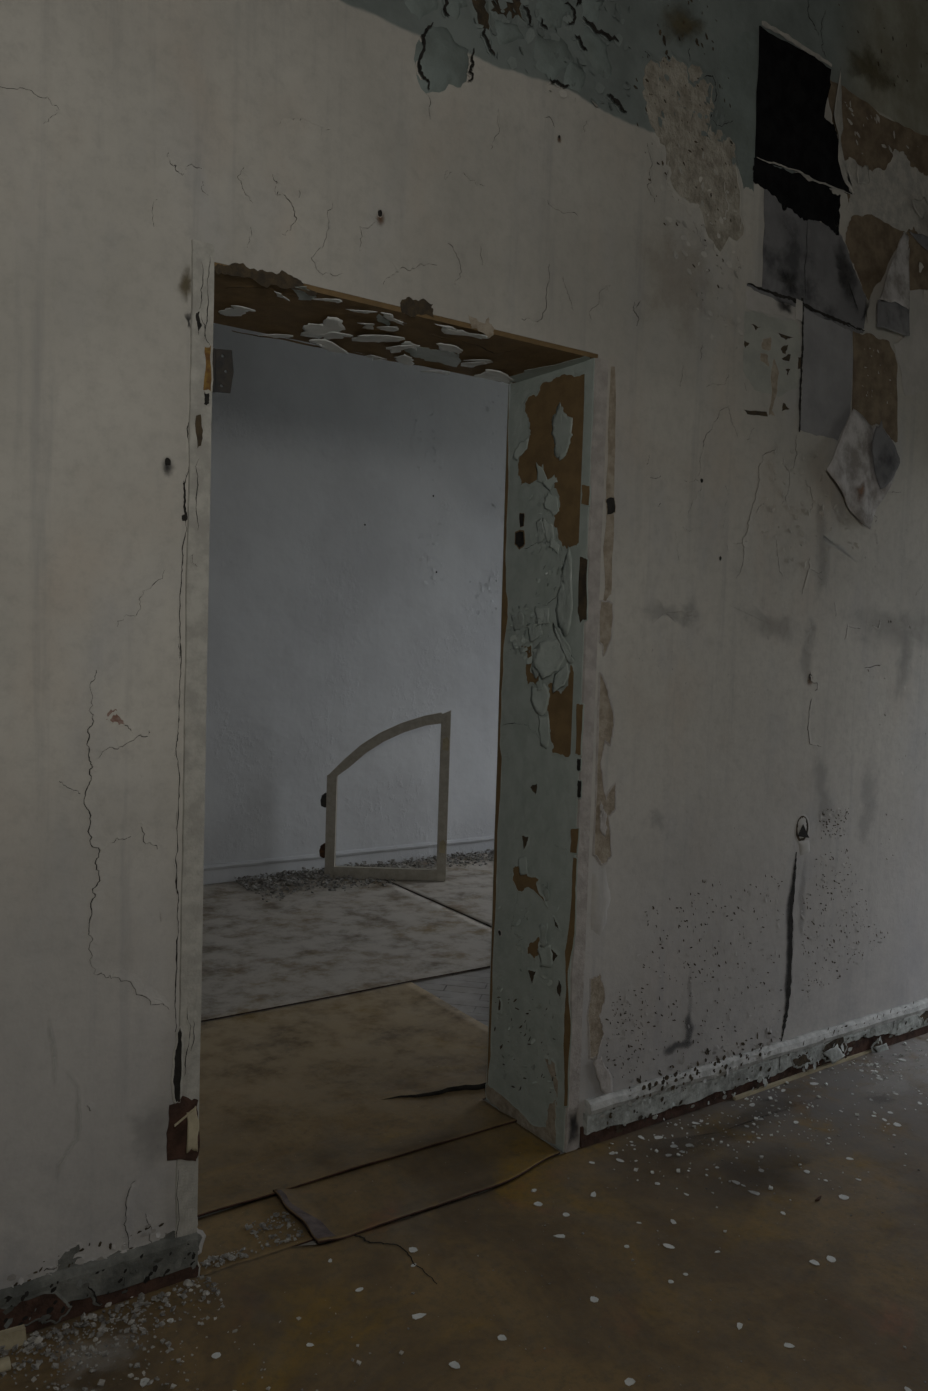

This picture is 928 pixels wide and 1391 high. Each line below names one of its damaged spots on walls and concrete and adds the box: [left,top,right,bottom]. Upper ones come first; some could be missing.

flaking render [639,31,758,257]
peeling [195,311,212,391]
peeling [214,263,928,1133]
peeling [0,1217,206,1331]